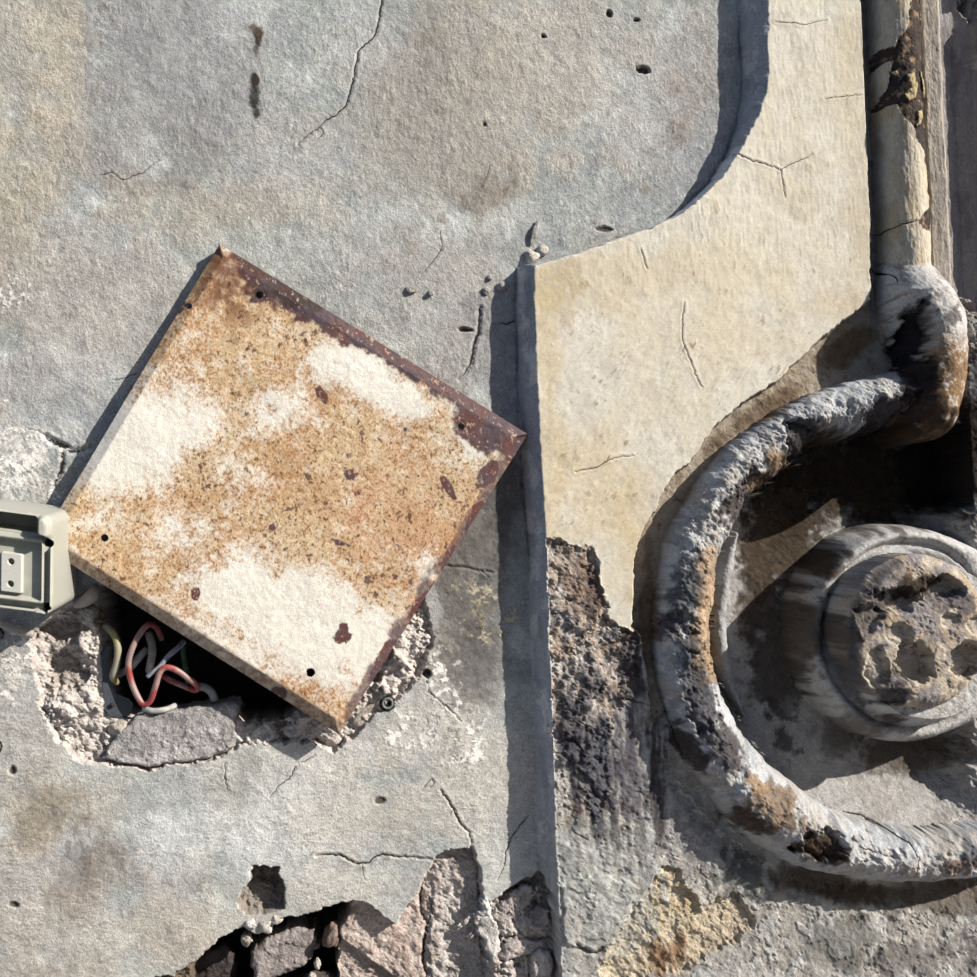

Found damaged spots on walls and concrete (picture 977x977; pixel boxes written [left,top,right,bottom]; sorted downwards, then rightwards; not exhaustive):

crack [302,0,383,140]
peeling [869,0,929,195]
peeling [919,209,931,231]
spalling [0,583,488,773]
peeling [546,538,649,822]
spalling [156,962,196,977]
crack [316,853,429,878]
spalling [224,846,563,977]
crack [419,882,433,977]
damp [547,670,668,954]
spalling [596,865,756,977]